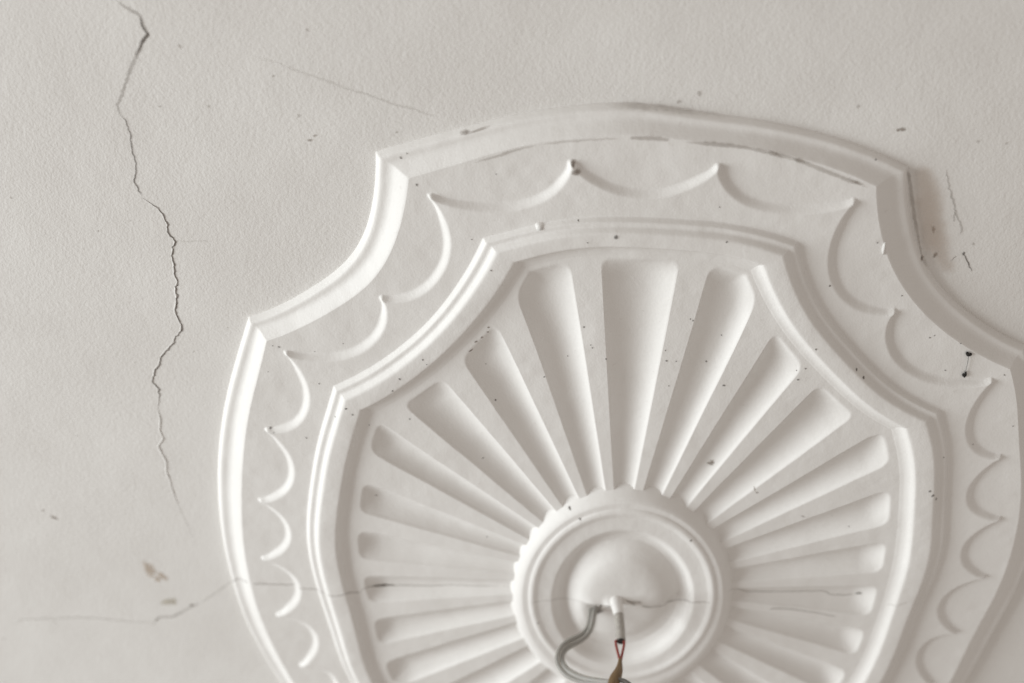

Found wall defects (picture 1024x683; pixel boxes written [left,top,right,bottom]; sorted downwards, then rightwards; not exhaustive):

crack [138,21,149,52]
crack [125,120,183,503]